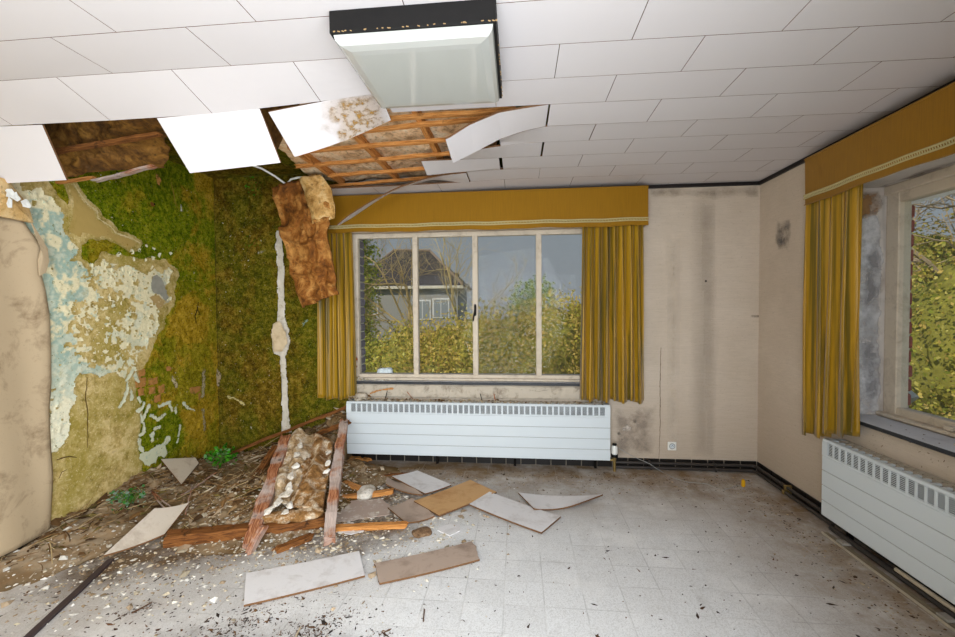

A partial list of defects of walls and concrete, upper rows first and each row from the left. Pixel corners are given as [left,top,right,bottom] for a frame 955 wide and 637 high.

leakage [330,98,383,138]
peeling [11,183,201,466]
peeling [859,213,883,414]